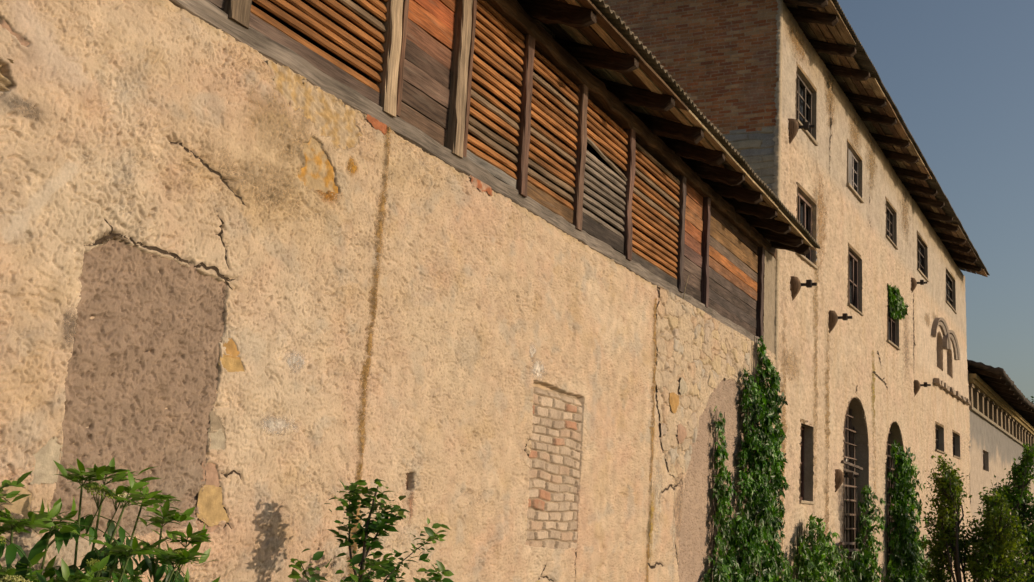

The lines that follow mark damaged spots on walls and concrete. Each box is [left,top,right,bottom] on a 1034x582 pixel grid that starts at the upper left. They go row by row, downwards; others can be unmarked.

flaking render [0,17,30,47]
flaking render [0,59,14,92]
crack [84,141,246,290]
flaking render [219,338,245,373]
flaking render [195,411,229,532]